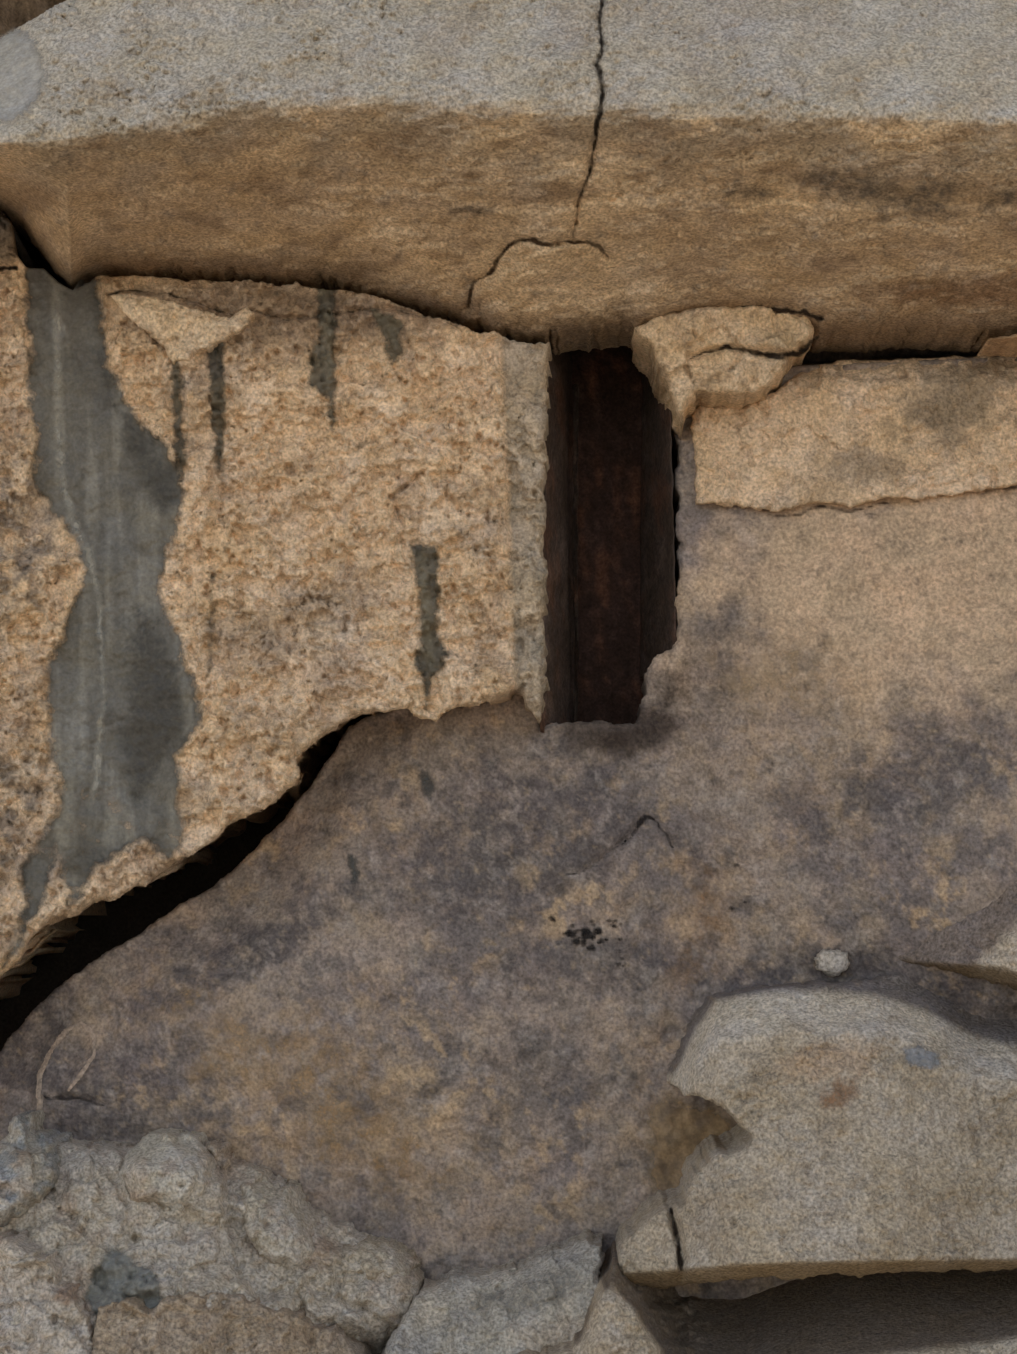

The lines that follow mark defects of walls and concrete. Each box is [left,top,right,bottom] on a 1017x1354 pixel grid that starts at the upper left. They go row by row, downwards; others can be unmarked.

crack [580,0,605,195]
water stain [208,342,226,470]
water stain [309,289,337,427]
water stain [371,308,403,362]
crack [467,238,603,307]
crack [781,501,919,516]
water stain [4,267,202,966]
water stain [411,545,448,710]
crack [44,1095,103,1106]
spalling [0,1229,95,1354]